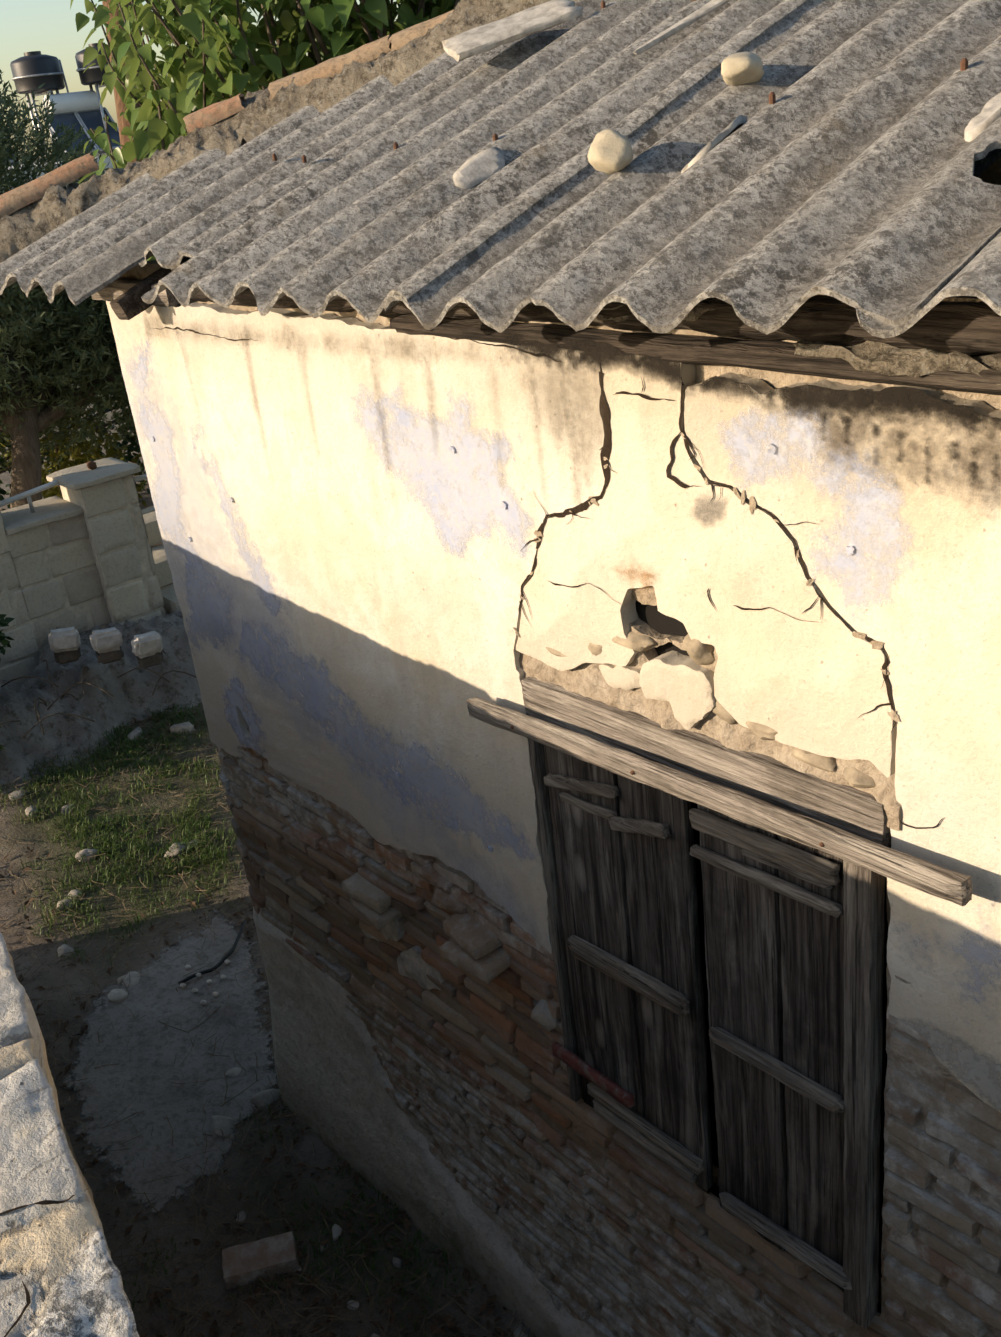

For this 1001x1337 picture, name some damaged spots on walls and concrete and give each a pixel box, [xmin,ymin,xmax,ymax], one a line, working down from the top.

crack [447,337,563,363]
leakage [505,333,1001,498]
crack [513,371,900,754]
spalling [519,586,901,831]
flaking render [218,727,1001,1337]
crack [0,1182,95,1215]
crack [4,1281,31,1337]